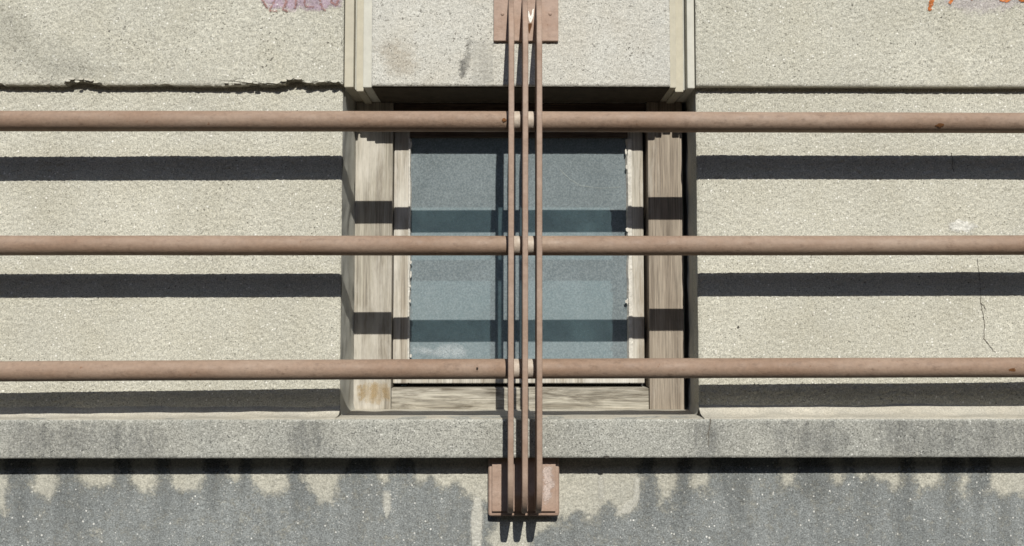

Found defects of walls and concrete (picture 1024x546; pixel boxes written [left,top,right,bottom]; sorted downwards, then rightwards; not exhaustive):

crack [977,259,995,352]
water stain [0,458,496,546]
water stain [530,457,1024,546]